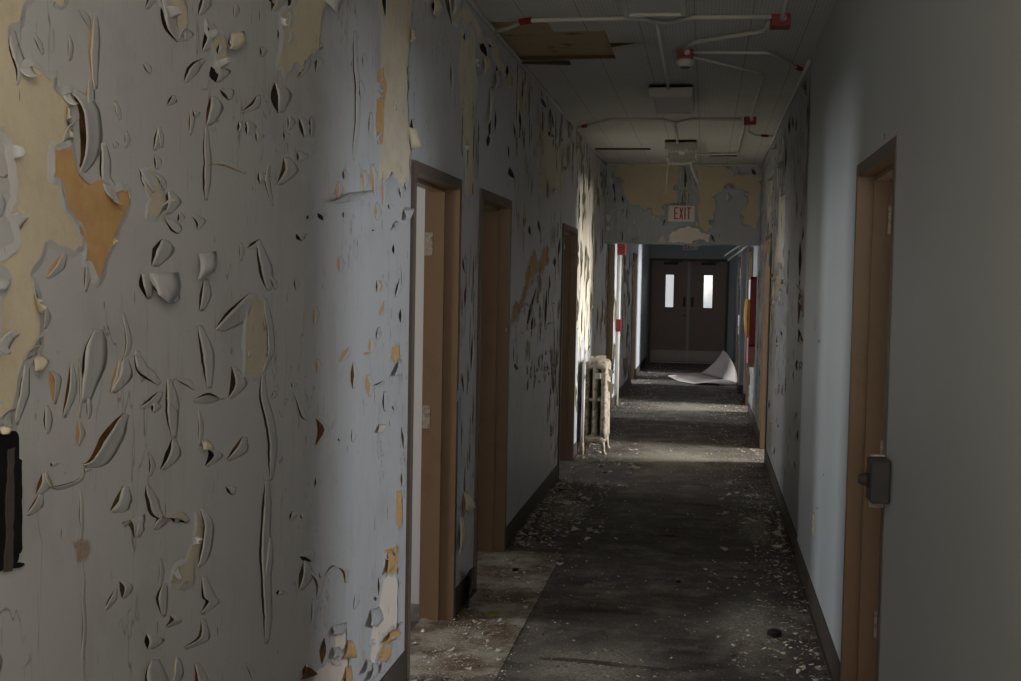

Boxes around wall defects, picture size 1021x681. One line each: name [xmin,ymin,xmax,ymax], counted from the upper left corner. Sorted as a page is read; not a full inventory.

peeling [237,0,344,142]
peeling [332,0,422,231]
peeling [0,0,182,470]
peeling [505,61,640,470]
peeling [110,485,190,538]
peeling [144,508,220,681]
peeling [201,436,249,467]
peeling [259,376,288,653]
peeling [315,418,330,446]
peeling [299,488,403,681]
peeling [339,338,376,406]
peeling [457,361,476,573]